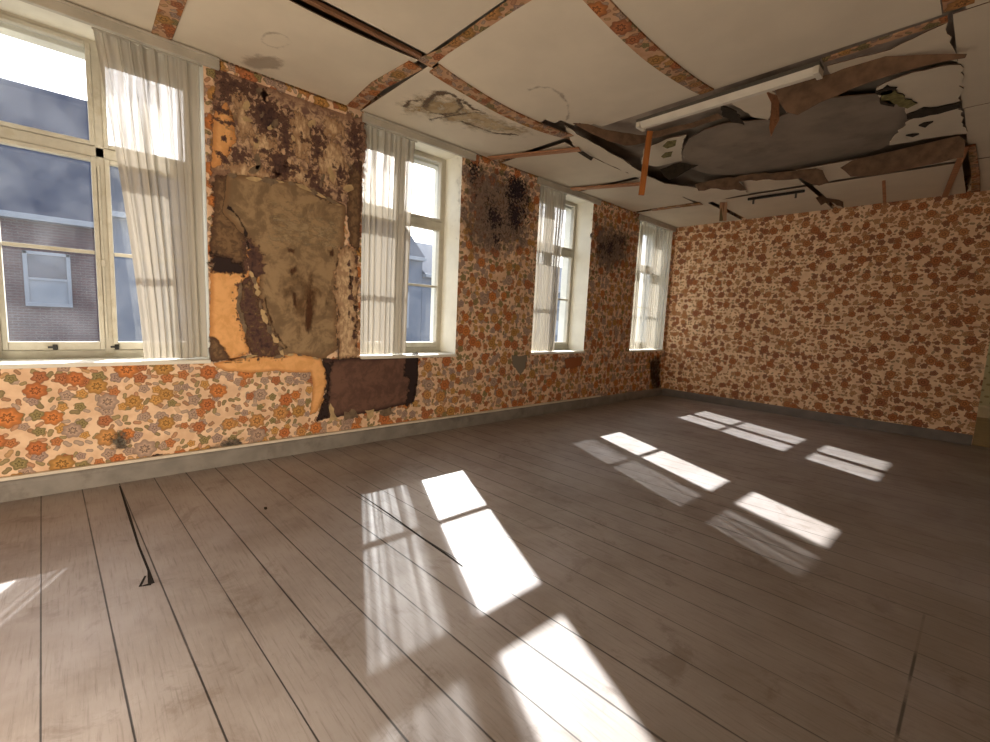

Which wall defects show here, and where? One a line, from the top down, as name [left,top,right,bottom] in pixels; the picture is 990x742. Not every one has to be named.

flaking render [222,175,346,359]
water stain [209,69,367,215]
water stain [463,161,532,251]
water stain [590,219,627,270]